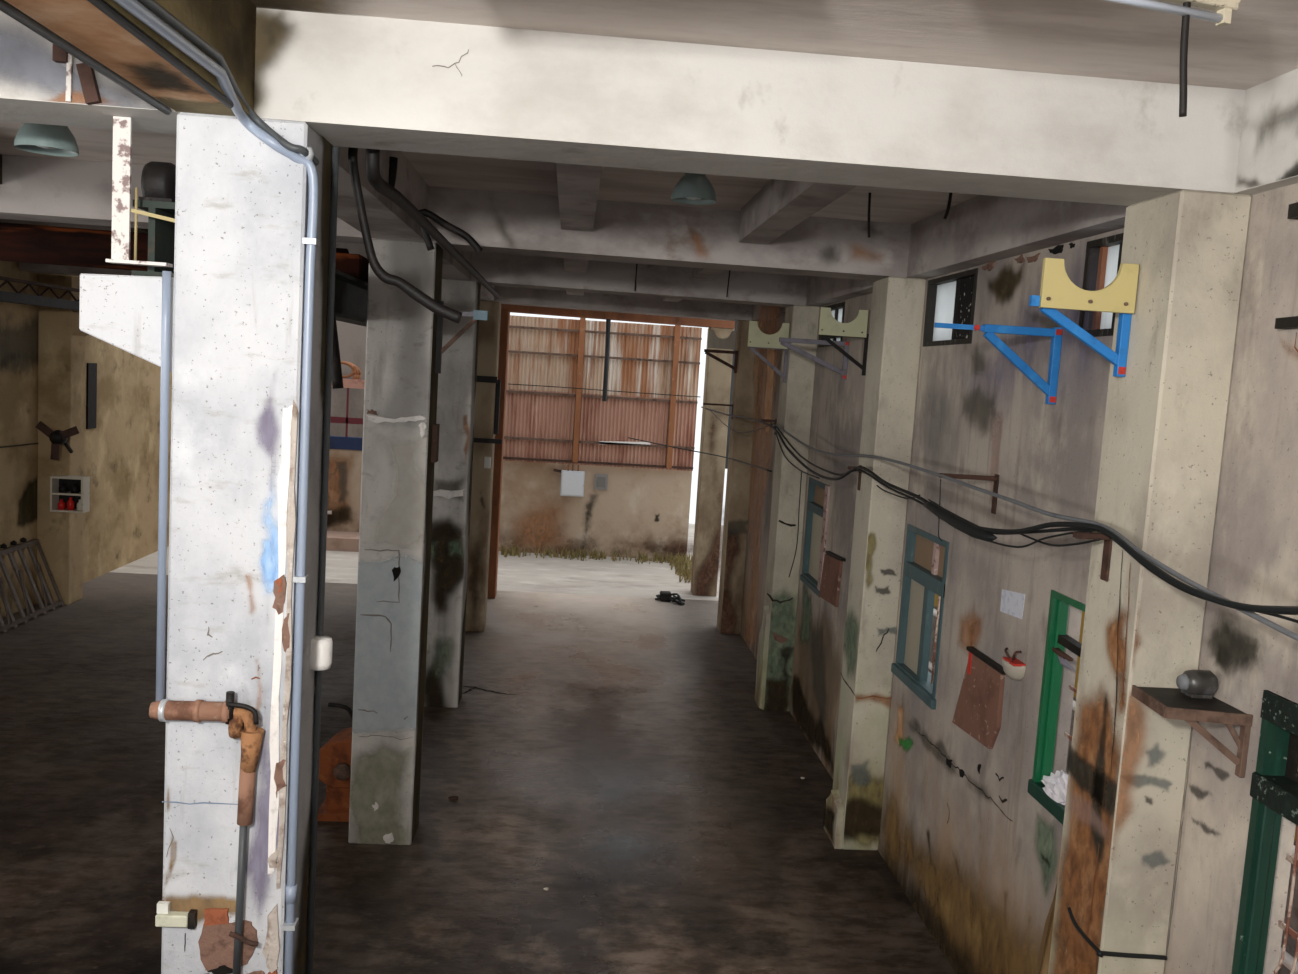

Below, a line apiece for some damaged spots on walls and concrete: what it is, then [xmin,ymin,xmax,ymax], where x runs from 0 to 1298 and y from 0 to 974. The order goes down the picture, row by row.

crack [432,49,469,77]
damp [1281,164,1298,180]
damp [431,521,464,613]
peeling [198,399,298,974]
damp [425,642,450,708]
damp [764,587,832,764]
damp [843,615,858,672]
damp [1211,618,1258,671]
corrosion [1052,550,1141,974]
damp [844,765,1040,974]
damp [1036,820,1055,890]